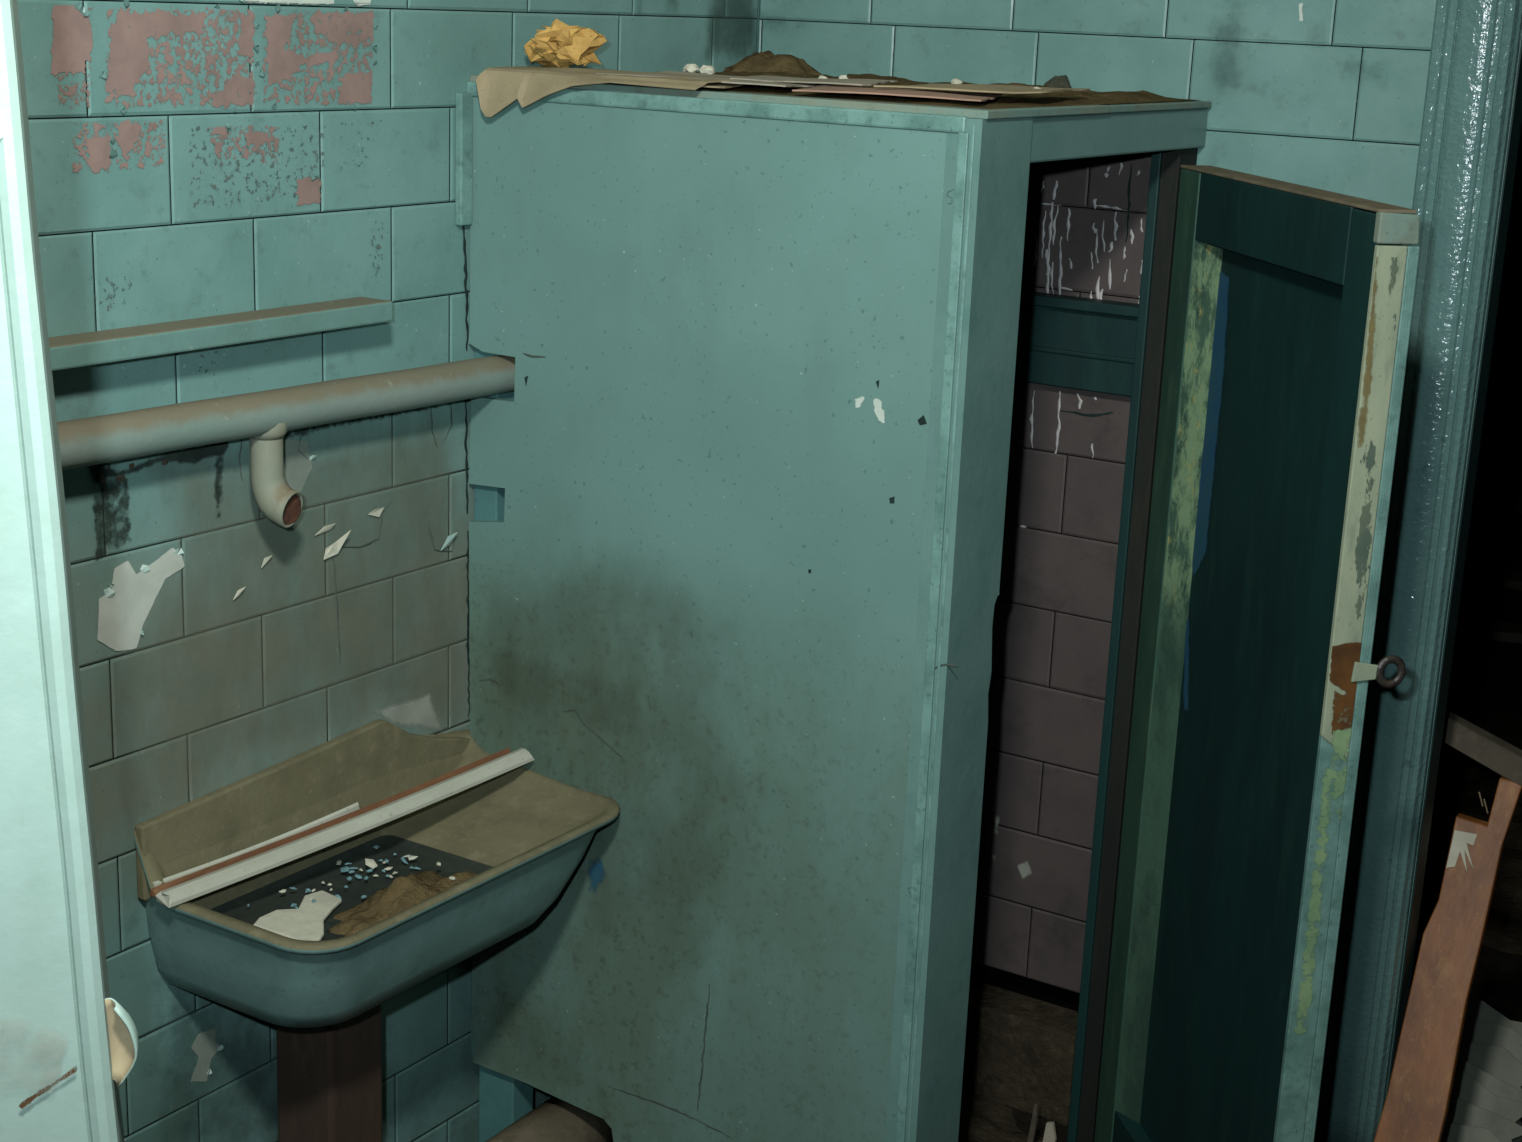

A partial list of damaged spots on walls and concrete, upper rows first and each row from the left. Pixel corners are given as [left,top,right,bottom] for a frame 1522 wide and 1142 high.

peeling [51,0,381,208]
peeling [97,548,184,651]
leakage [89,441,228,559]
peeling [316,523,351,560]